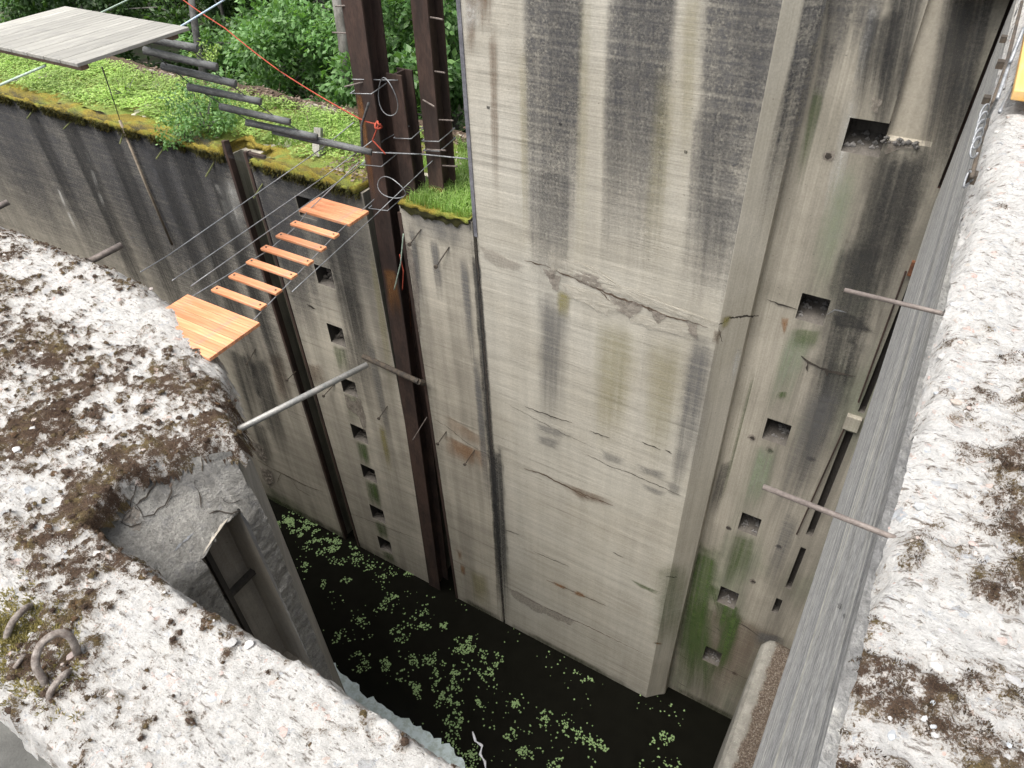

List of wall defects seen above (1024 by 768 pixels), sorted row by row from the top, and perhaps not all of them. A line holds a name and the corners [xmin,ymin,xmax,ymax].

water stain [526,0,581,189]
water stain [608,0,673,155]
water stain [777,0,920,152]
water stain [431,221,458,282]
water stain [461,265,472,336]
crack [524,260,797,341]
crack [120,481,240,527]
water stain [475,370,507,584]
crack [438,242,681,653]